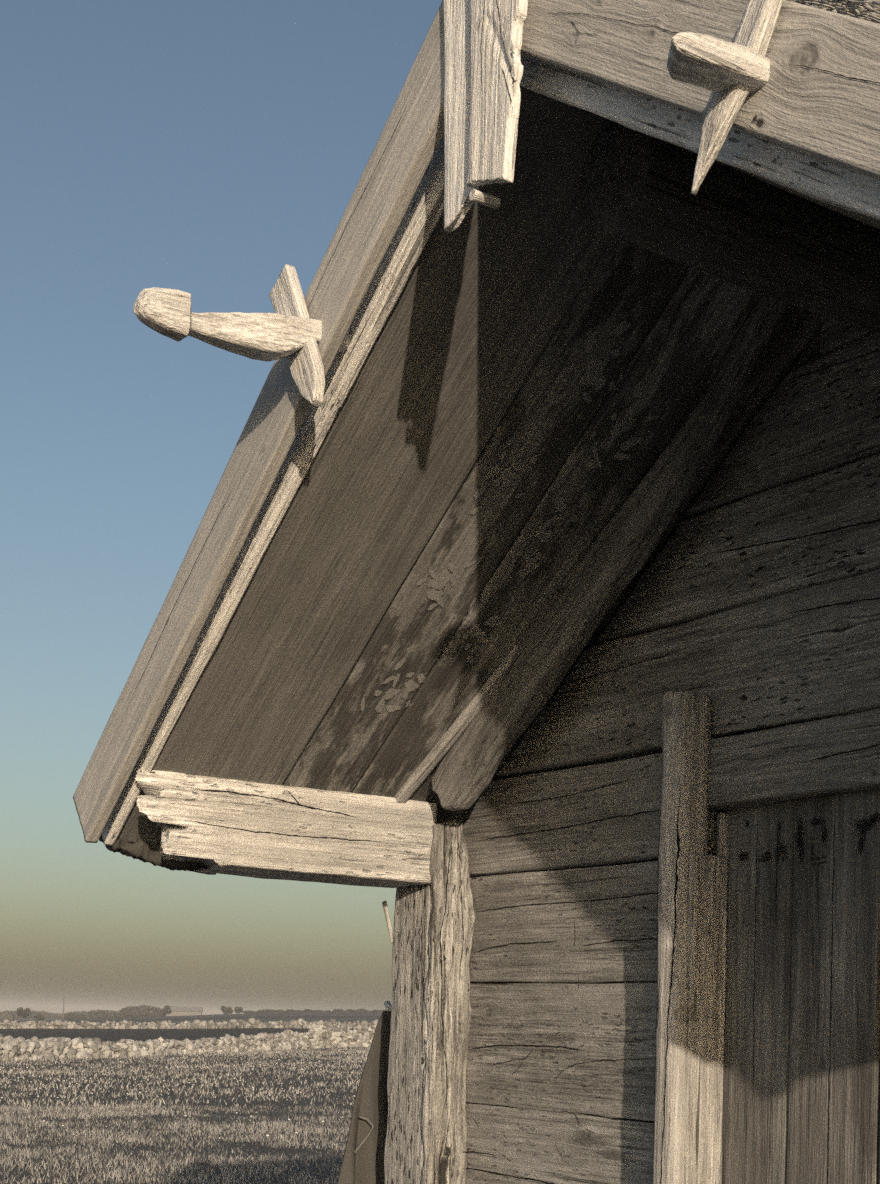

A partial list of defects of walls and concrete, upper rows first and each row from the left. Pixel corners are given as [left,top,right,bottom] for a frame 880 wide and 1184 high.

crack [783,63,880,84]
crack [186,790,377,842]